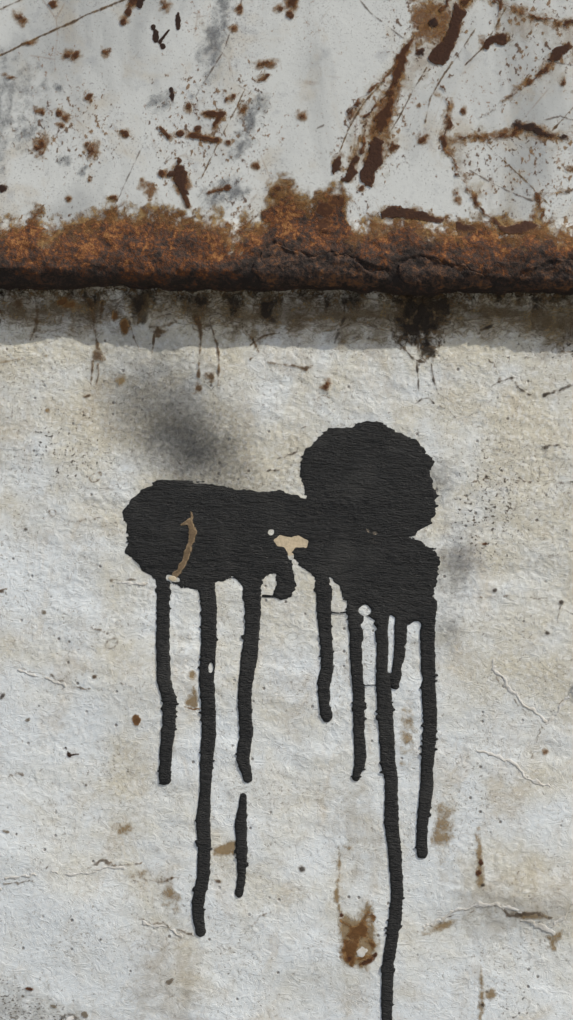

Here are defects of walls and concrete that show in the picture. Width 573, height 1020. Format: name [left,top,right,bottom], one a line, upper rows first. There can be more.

corrosion [274,0,299,19]
corrosion [480,0,573,50]
corrosion [257,59,275,82]
corrosion [32,134,49,155]
corrosion [34,108,70,128]
corrosion [84,141,100,160]
corrosion [159,94,248,145]
corrosion [449,119,569,145]
corrosion [0,158,573,391]
damp [0,290,445,404]
damp [436,293,573,358]
corrosion [334,879,377,970]